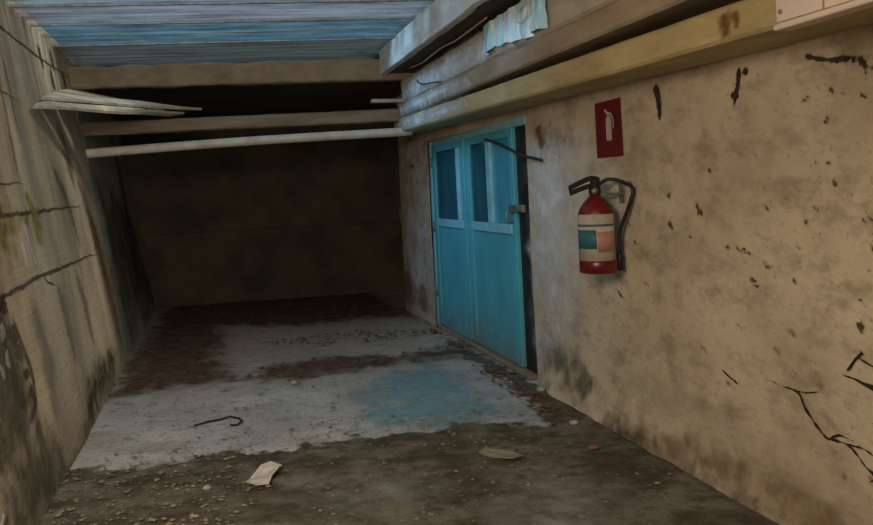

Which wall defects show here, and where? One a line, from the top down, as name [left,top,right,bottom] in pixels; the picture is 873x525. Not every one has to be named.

rust [721,12,738,37]
crack [0,26,70,78]
crack [0,205,80,218]
crack [0,251,103,299]
crack [843,351,873,391]
crack [772,381,873,483]